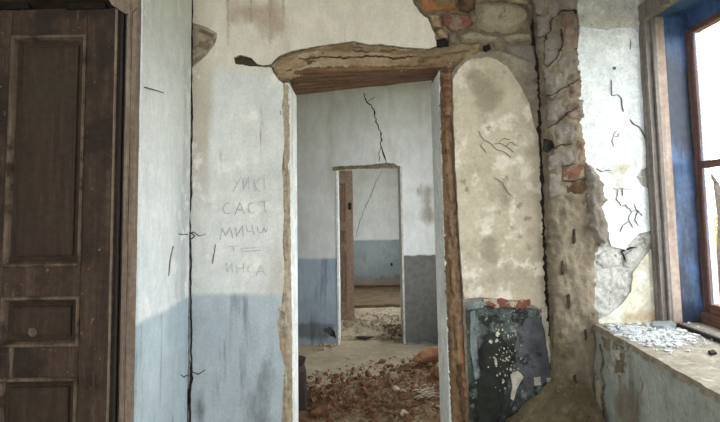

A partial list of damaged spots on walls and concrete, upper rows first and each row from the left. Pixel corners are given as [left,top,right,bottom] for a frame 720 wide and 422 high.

crack [178,0,205,422]
crack [356,94,387,236]
crack [479,132,518,158]
flaking render [413,0,640,200]
crack [611,80,645,147]
crack [614,188,642,232]
spalling [637,168,647,188]
spalling [594,232,651,319]
peeling [465,298,551,422]
spalling [601,337,630,378]